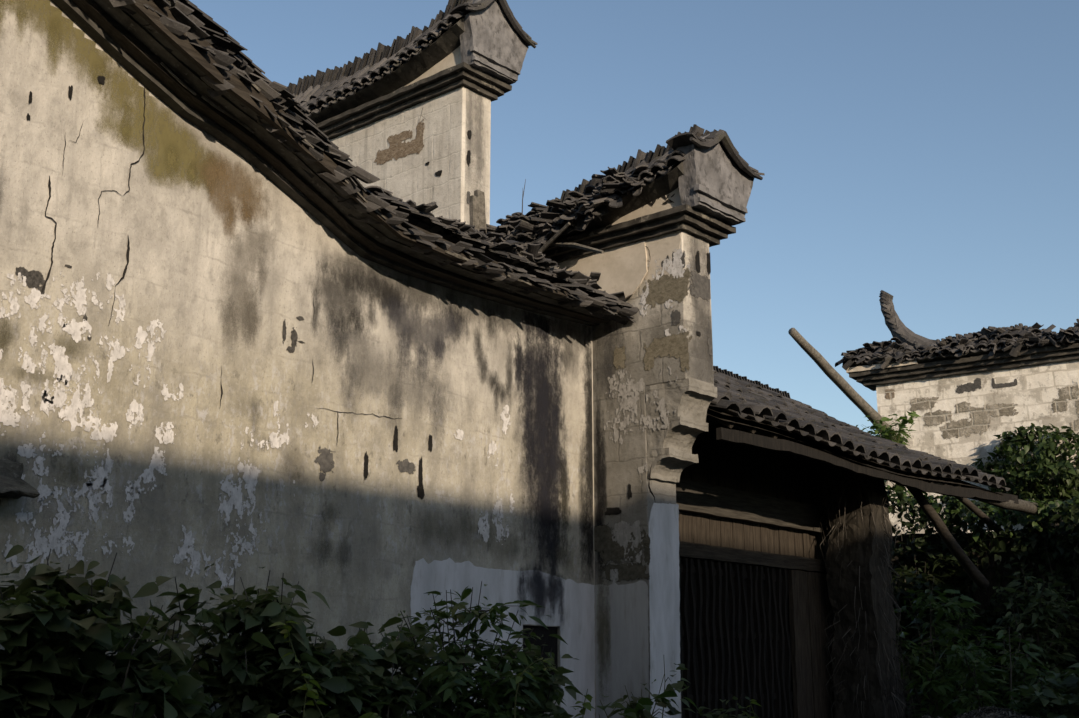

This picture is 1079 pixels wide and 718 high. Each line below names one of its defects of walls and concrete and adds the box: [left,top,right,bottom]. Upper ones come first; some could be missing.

crack [41,124,83,294]
flaking render [0,264,176,576]
crack [108,236,130,326]
crack [98,86,146,221]
flaking render [173,401,290,589]
leakage [314,259,462,367]
spalling [374,119,442,176]
leakage [475,304,573,621]
leakage [580,352,611,567]
flaking render [563,240,713,444]
spalling [910,378,1018,440]
spalling [1051,385,1079,431]